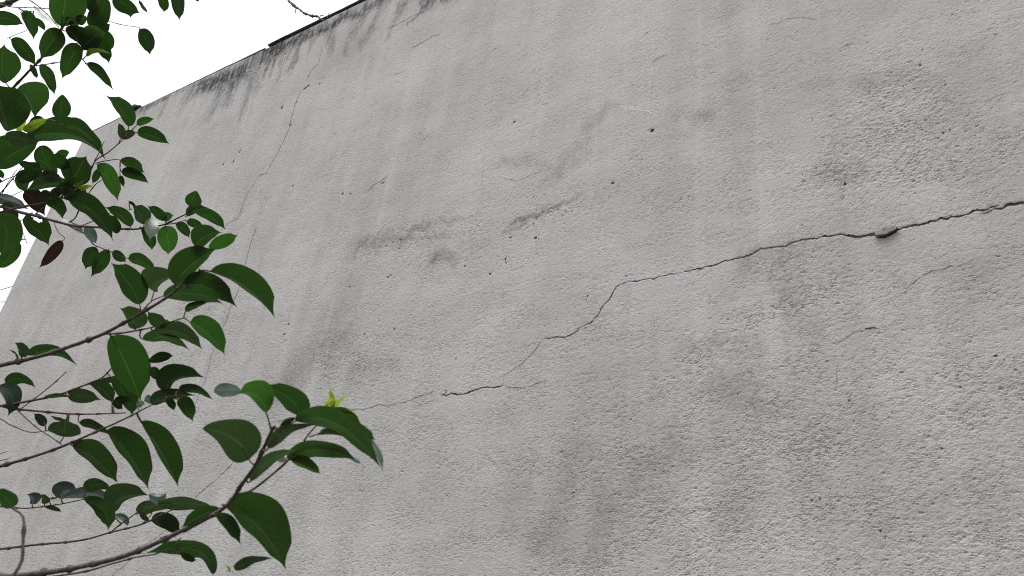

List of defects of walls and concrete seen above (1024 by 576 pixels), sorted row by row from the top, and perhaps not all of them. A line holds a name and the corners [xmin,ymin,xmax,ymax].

leakage [200,5,366,130]
crack [352,201,1024,410]